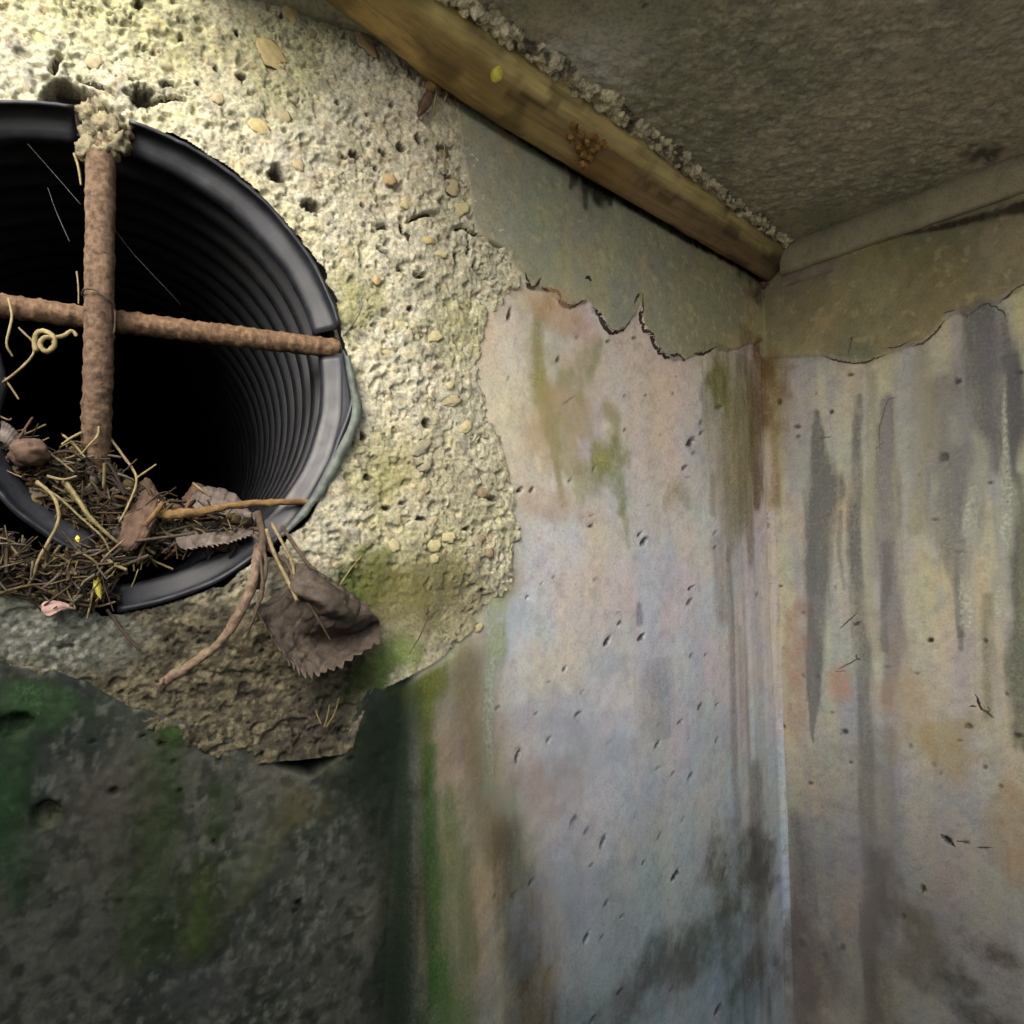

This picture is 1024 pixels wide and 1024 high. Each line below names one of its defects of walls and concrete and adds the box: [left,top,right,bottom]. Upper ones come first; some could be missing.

spalling [0,0,533,764]
leakage [414,666,470,1024]
leakage [787,374,902,854]
leakage [920,304,1024,748]